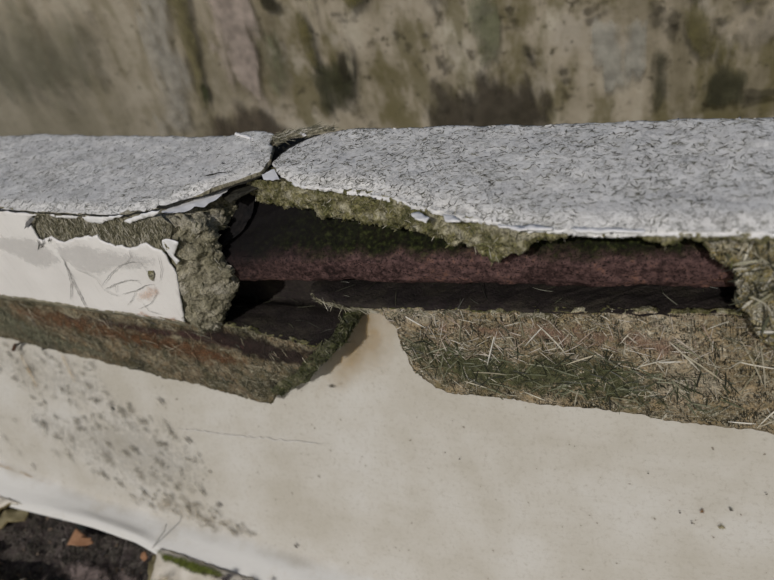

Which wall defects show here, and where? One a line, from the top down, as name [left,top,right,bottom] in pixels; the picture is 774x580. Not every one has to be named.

water stain [138,0,209,134]
water stain [209,0,284,146]
water stain [295,12,352,113]
water stain [428,70,551,127]
water stain [655,52,667,107]
water stain [707,65,774,105]
spalling [24,188,240,331]
crack [0,122,340,217]
spalling [246,167,774,263]